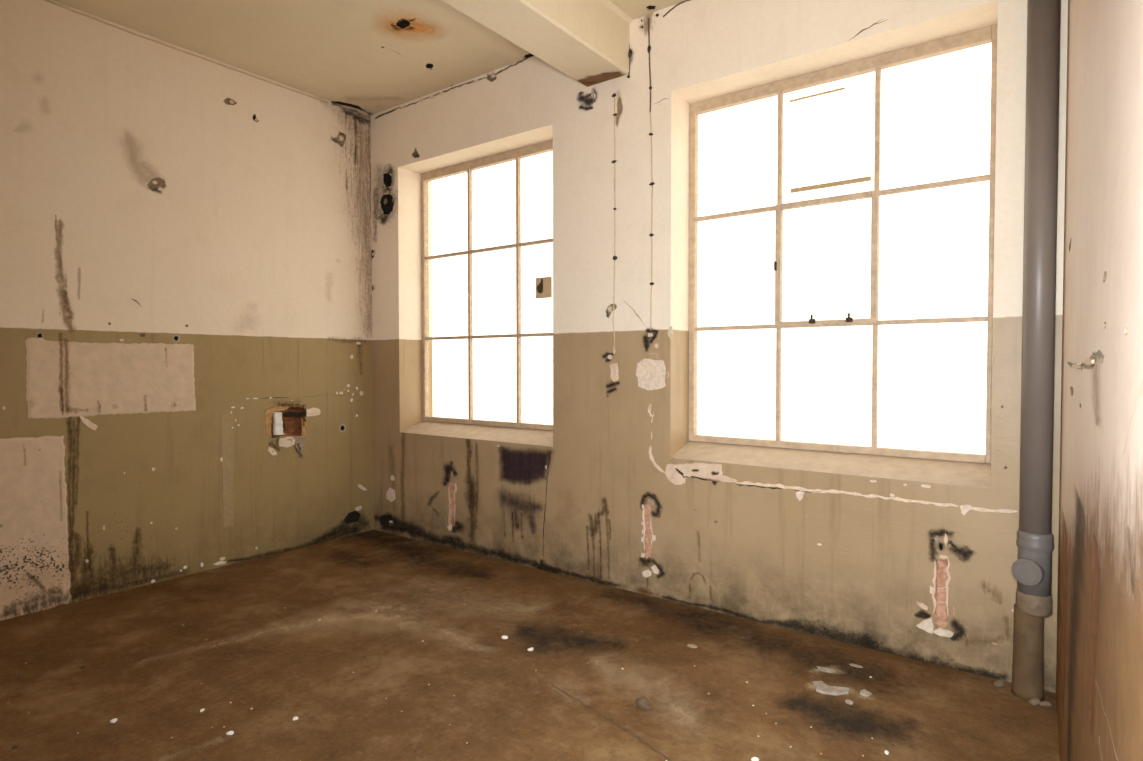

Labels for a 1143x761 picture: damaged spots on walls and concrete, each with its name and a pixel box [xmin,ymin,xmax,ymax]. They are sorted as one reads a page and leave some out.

corrosion [389,18,429,32]
water stain [332,103,375,236]
water stain [0,221,171,617]
spalling [443,462,463,533]
spalling [639,493,665,586]
spalling [915,529,973,641]